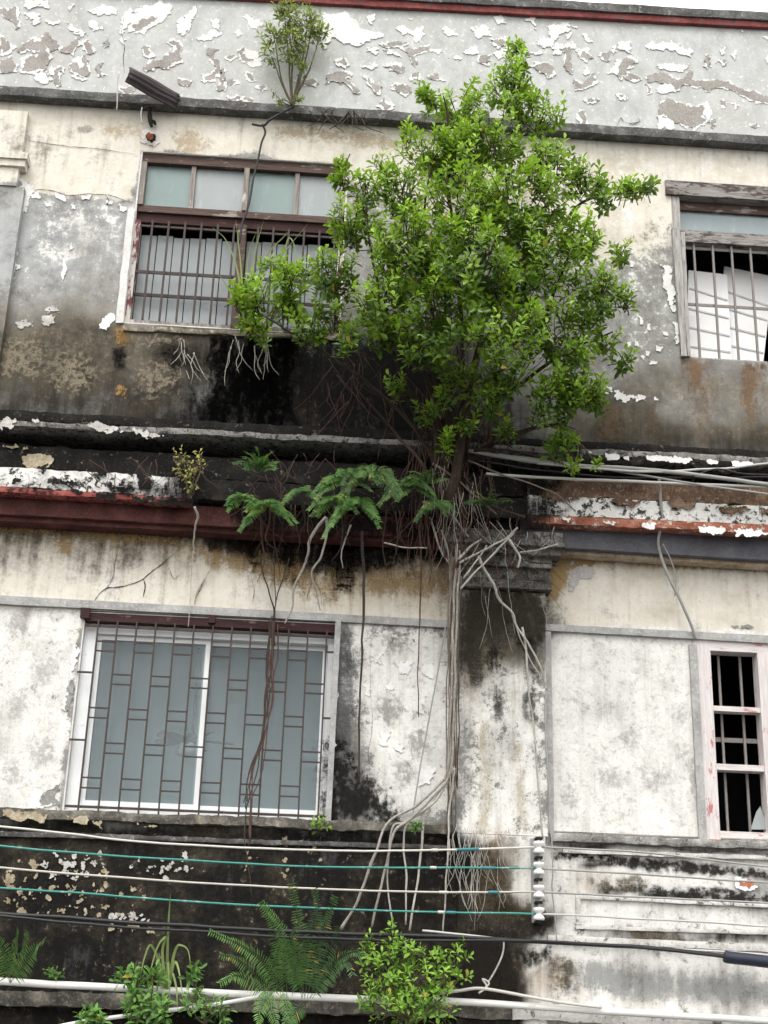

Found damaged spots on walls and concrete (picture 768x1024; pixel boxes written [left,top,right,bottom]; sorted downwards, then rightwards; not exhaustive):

peeling [0,0,268,102]
peeling [525,17,768,131]
damp [0,341,94,390]
flaking render [87,421,164,439]
damp [112,328,456,433]
flaking render [605,453,754,474]
corrosion [742,363,765,421]
damp [0,474,568,601]
peeling [698,504,768,537]
damp [319,628,401,822]
flaking render [4,850,155,934]
damp [457,843,768,1003]